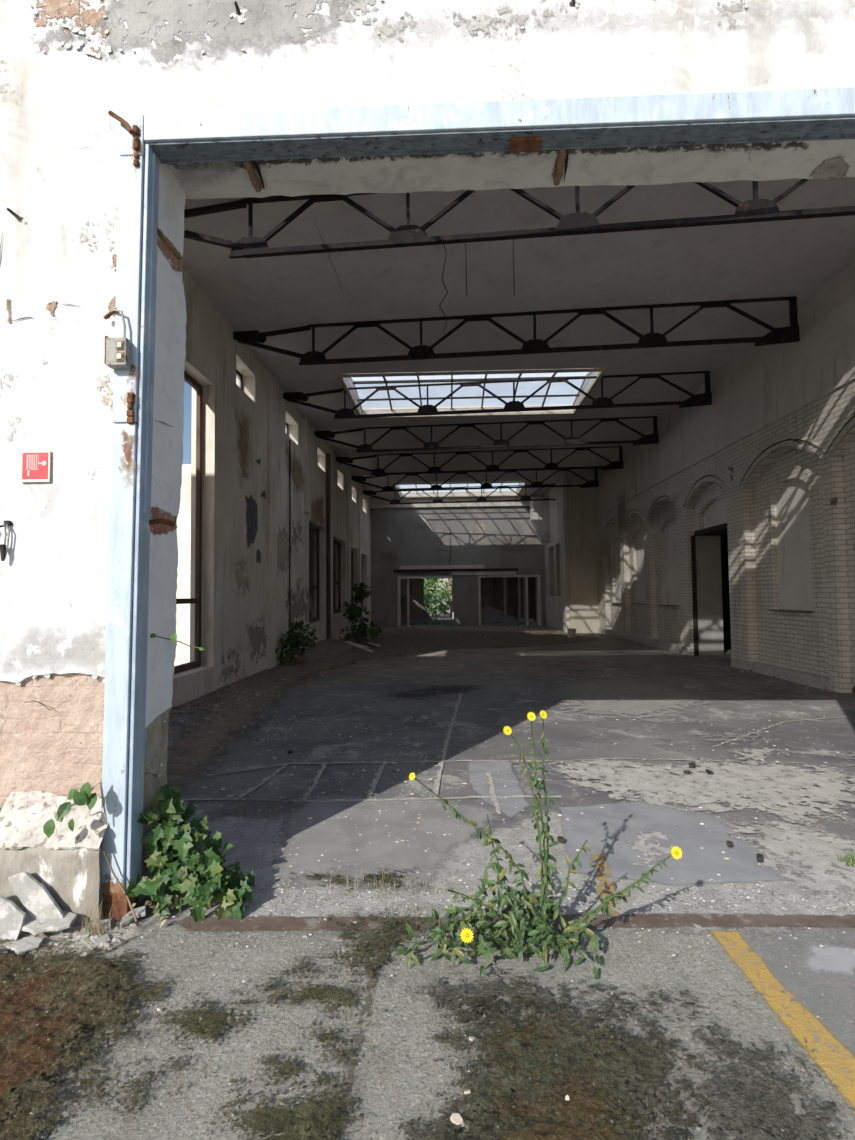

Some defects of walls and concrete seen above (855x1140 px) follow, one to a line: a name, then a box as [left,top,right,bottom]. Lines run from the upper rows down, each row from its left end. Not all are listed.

flaking render [31,0,416,68]
peeling [445,0,579,39]
peeling [717,0,749,29]
water stain [239,418,248,475]
water stain [221,620,266,679]
flaking render [0,673,105,810]